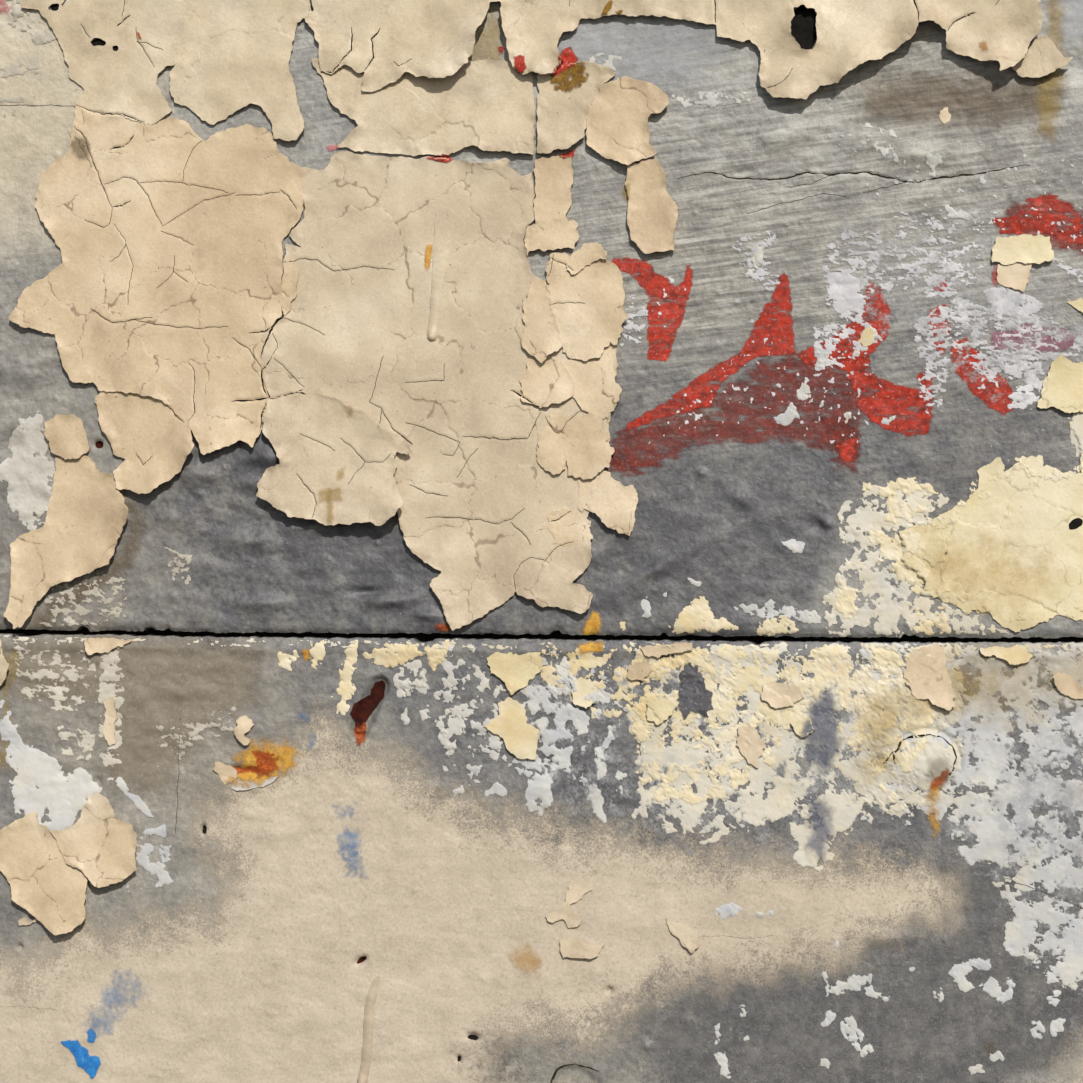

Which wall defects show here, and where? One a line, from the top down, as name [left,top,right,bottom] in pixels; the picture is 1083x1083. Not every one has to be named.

crack [678,165,1030,214]
peeling [0,0,1073,659]
peeling [336,204,1083,1007]
peeling [277,640,327,671]
peeling [161,715,254,745]
corrosion [350,680,386,745]
peeling [0,638,174,935]
peeling [213,762,279,791]
corrosion [232,742,296,786]
peeling [1030,1018,1066,1039]